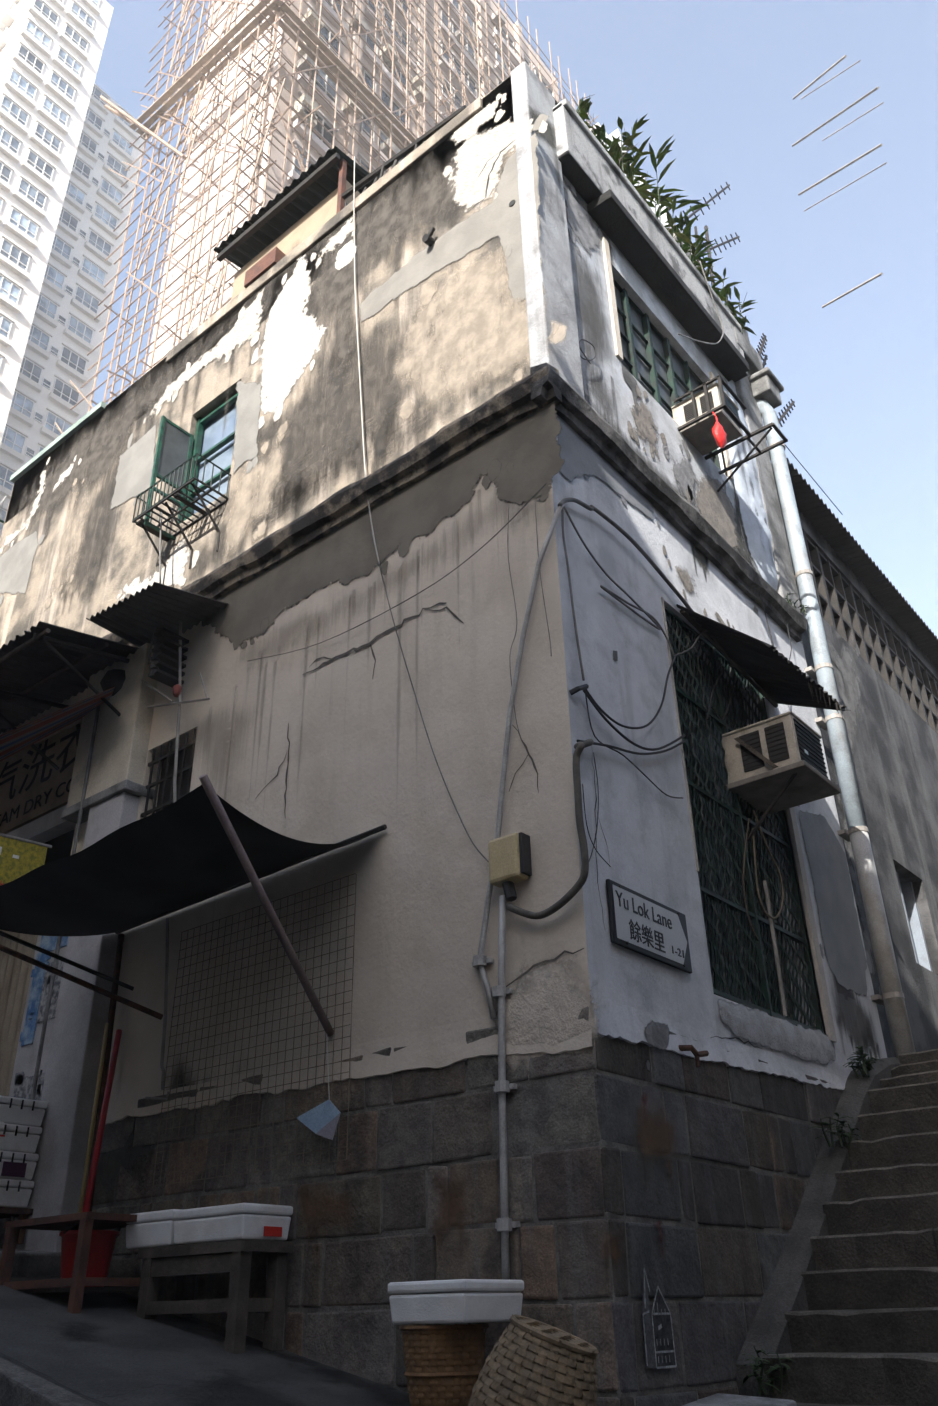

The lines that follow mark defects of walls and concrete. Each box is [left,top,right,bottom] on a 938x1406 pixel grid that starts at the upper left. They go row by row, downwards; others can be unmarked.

flaking render [443,93,548,212]
leakage [19,158,464,603]
flaking render [143,217,357,555]
flaking render [621,364,739,548]
crack [302,602,464,679]